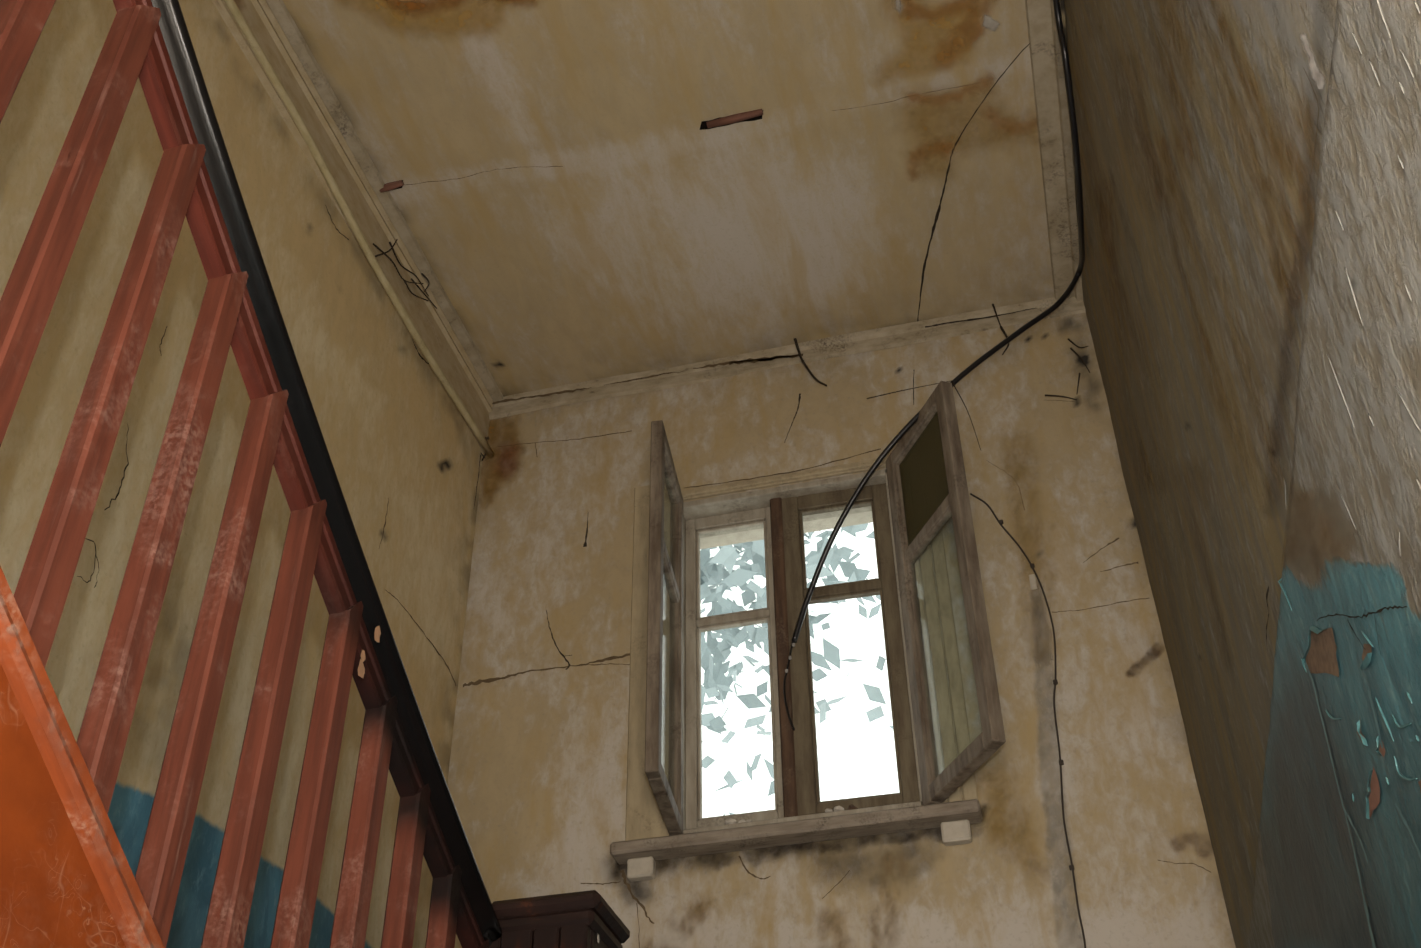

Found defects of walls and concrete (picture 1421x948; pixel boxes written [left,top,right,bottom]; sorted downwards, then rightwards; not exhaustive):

crack [833,43,1035,328]
crack [1052,538,1149,613]
crack [386,590,630,687]
peeling [1301,626,1339,677]
crack [1317,605,1407,655]
peeling [1325,697,1421,819]